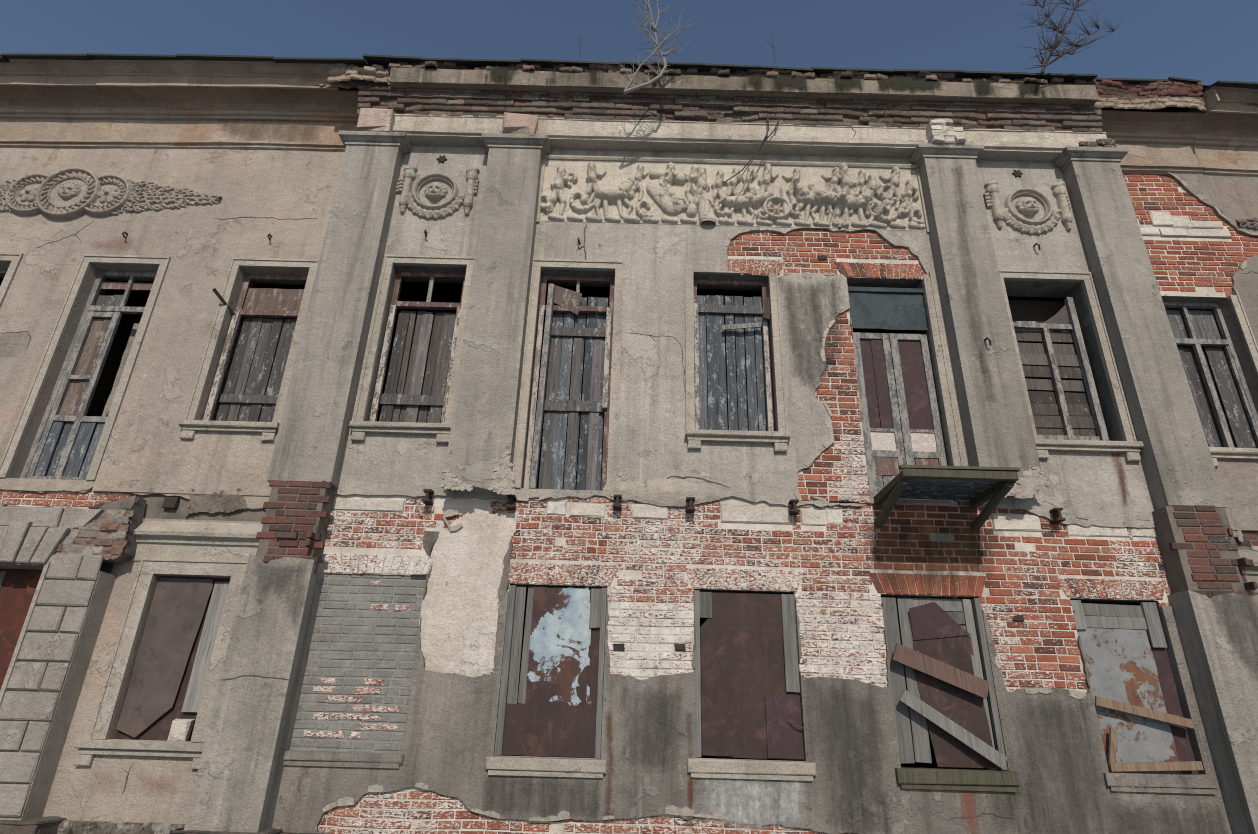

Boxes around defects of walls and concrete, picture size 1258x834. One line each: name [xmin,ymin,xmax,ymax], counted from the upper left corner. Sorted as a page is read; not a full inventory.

flaking render [724,224,928,281]
flaking render [1123,172,1258,300]
flaking render [0,483,138,560]
spalling [162,488,247,516]
flaking render [256,309,1258,706]
flaking render [315,782,858,834]
water stain [714,781,799,824]